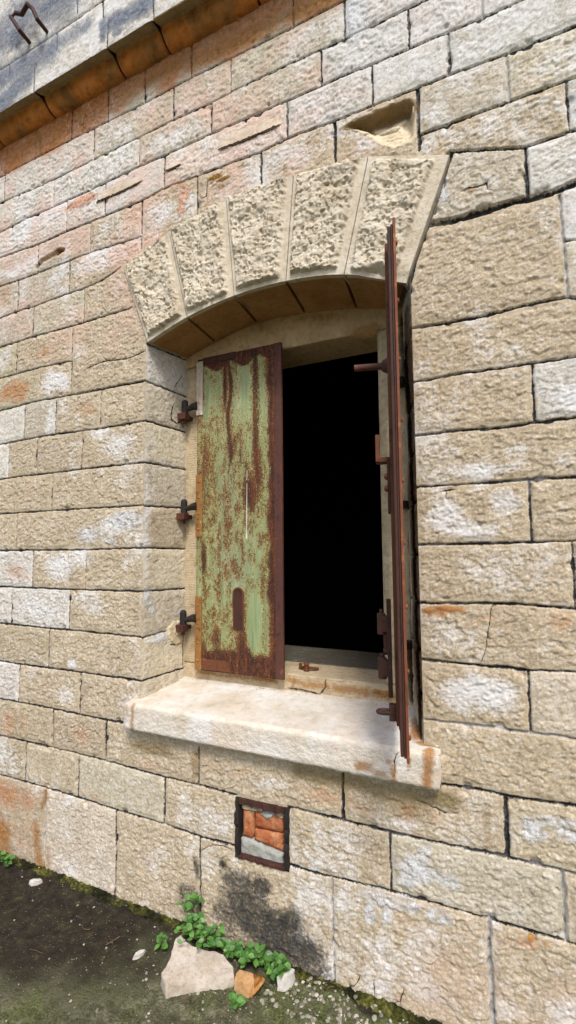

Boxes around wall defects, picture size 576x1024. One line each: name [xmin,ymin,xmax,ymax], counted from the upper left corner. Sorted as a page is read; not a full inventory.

spalling [218,117,281,150]
spalling [340,98,420,148]
crack [480,602,517,664]
corrosion [411,719,436,787]
damp [180,857,331,978]